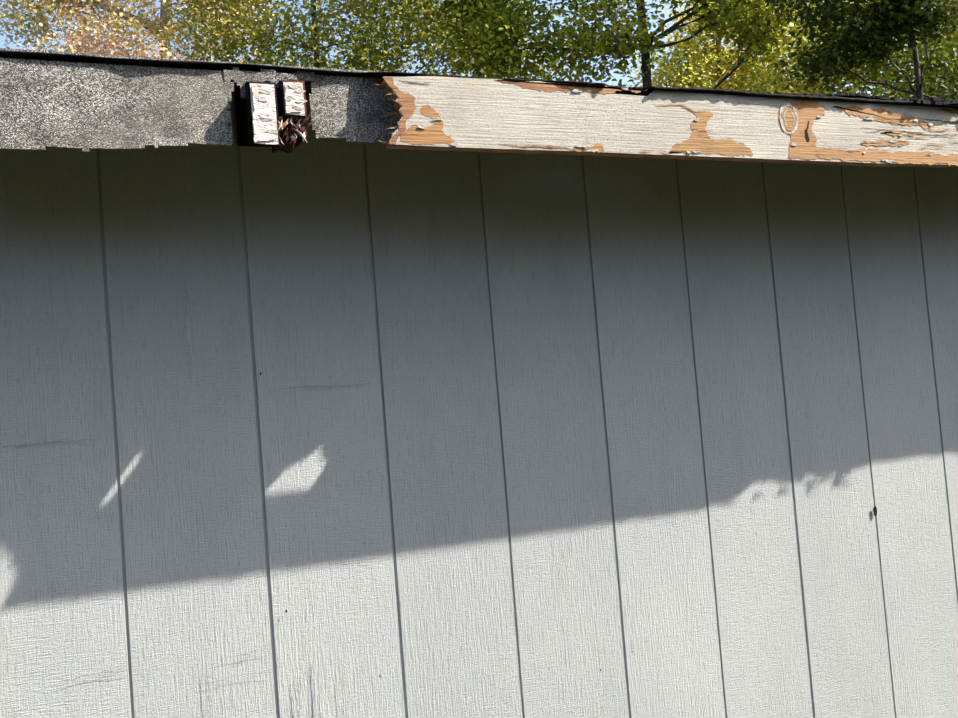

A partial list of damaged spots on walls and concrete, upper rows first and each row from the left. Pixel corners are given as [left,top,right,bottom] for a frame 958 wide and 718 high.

peeling [496,79,647,95]
peeling [400,104,458,146]
peeling [573,144,605,153]
peeling [643,110,753,157]
peeling [787,100,958,166]